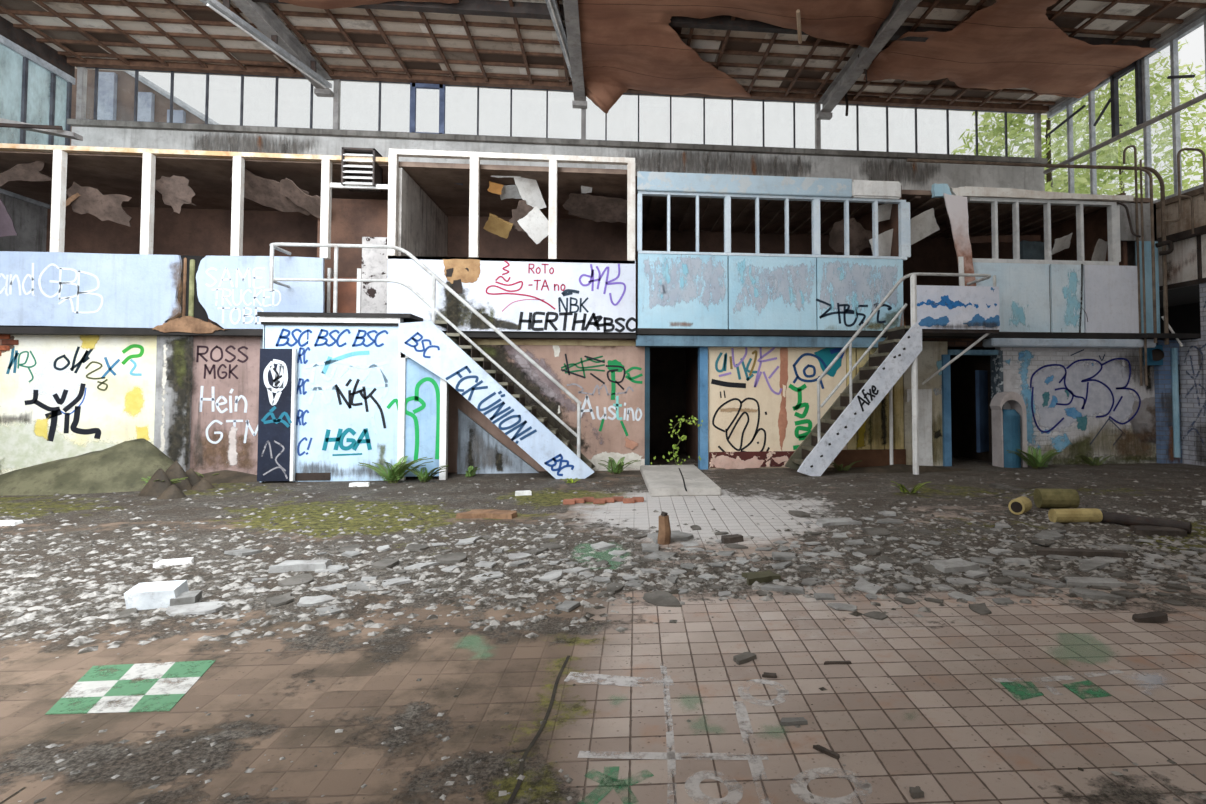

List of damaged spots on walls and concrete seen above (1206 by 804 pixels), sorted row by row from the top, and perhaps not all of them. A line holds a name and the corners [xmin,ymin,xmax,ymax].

peeling [644,254,899,317]
peeling [917,287,1025,328]
flaking render [0,334,19,356]